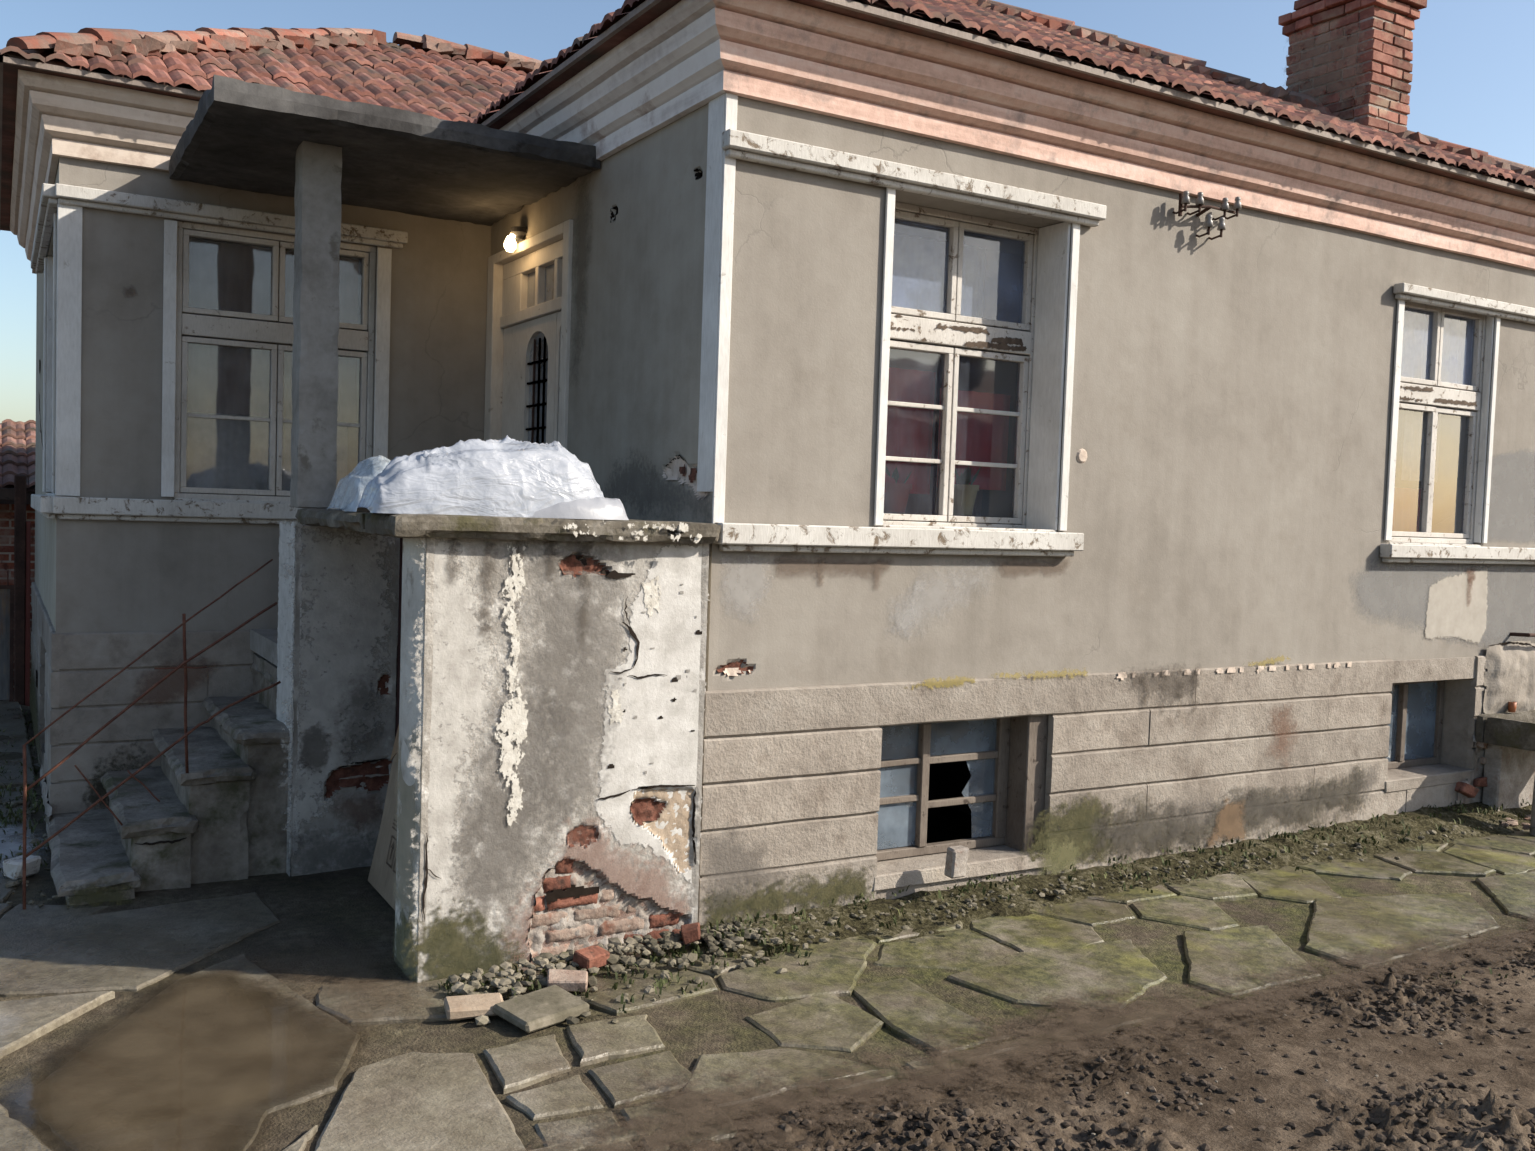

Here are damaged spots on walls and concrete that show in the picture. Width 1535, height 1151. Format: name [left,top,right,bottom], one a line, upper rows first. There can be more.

peeling [890,314,1027,351]
spalling [662,454,708,500]
peeling [281,528,398,833]
crack [610,597,667,679]
peeling [410,538,530,950]
peeling [527,544,754,992]
water stain [1095,766,1365,861]